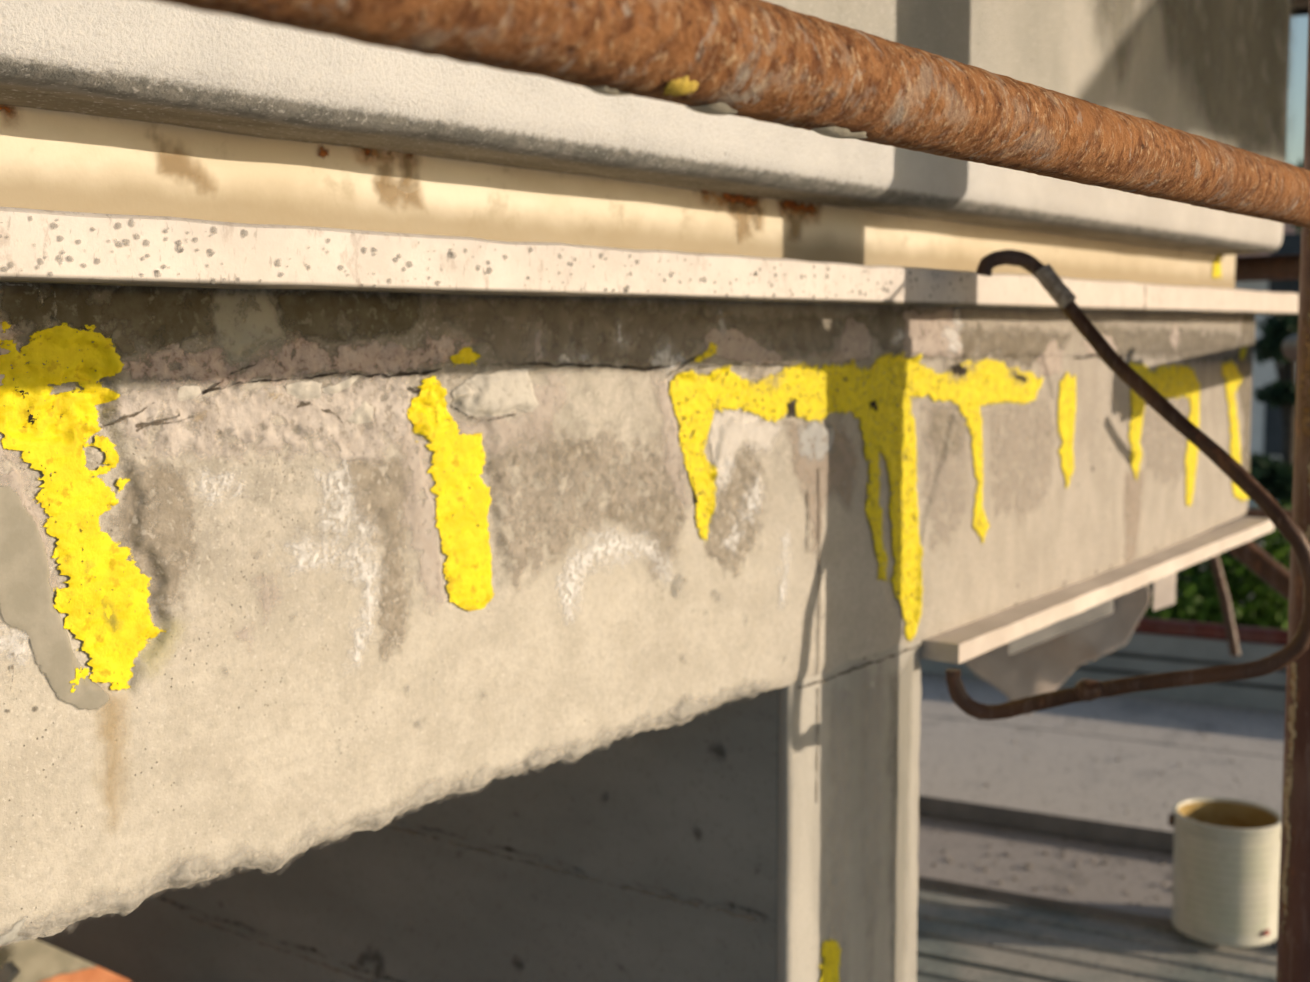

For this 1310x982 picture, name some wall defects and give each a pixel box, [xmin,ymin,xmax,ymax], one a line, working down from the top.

corrosion [701,190,761,239]
corrosion [781,200,821,238]
spalling [0,318,22,386]
crack [491,354,791,378]
efflorescence [0,631,27,655]
crack [798,468,927,803]
spalling [0,682,769,946]